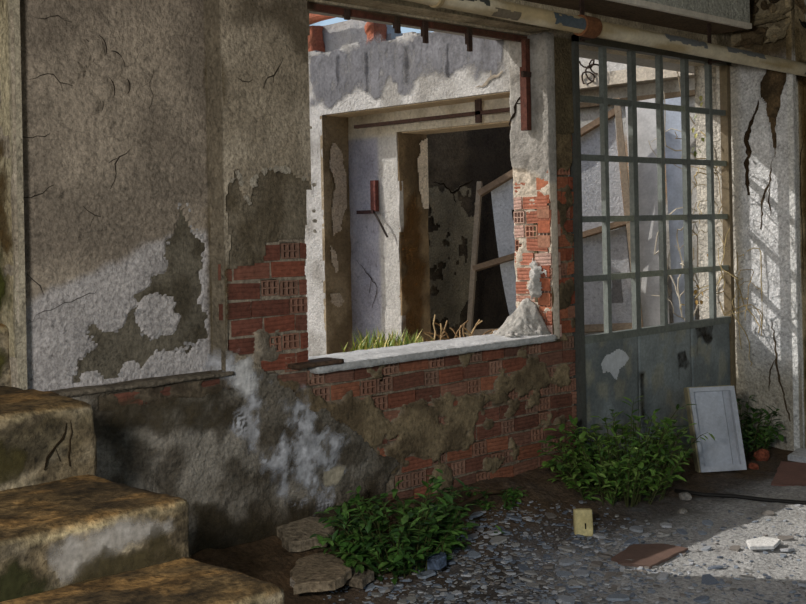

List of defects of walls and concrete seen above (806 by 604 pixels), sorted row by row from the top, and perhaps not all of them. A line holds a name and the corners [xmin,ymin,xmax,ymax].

peeling [462,0,522,21]
crack [109,152,134,189]
crack [744,100,773,229]
peeling [68,203,208,383]
flaking render [218,134,577,502]
damp [100,355,261,449]
damp [193,402,375,555]